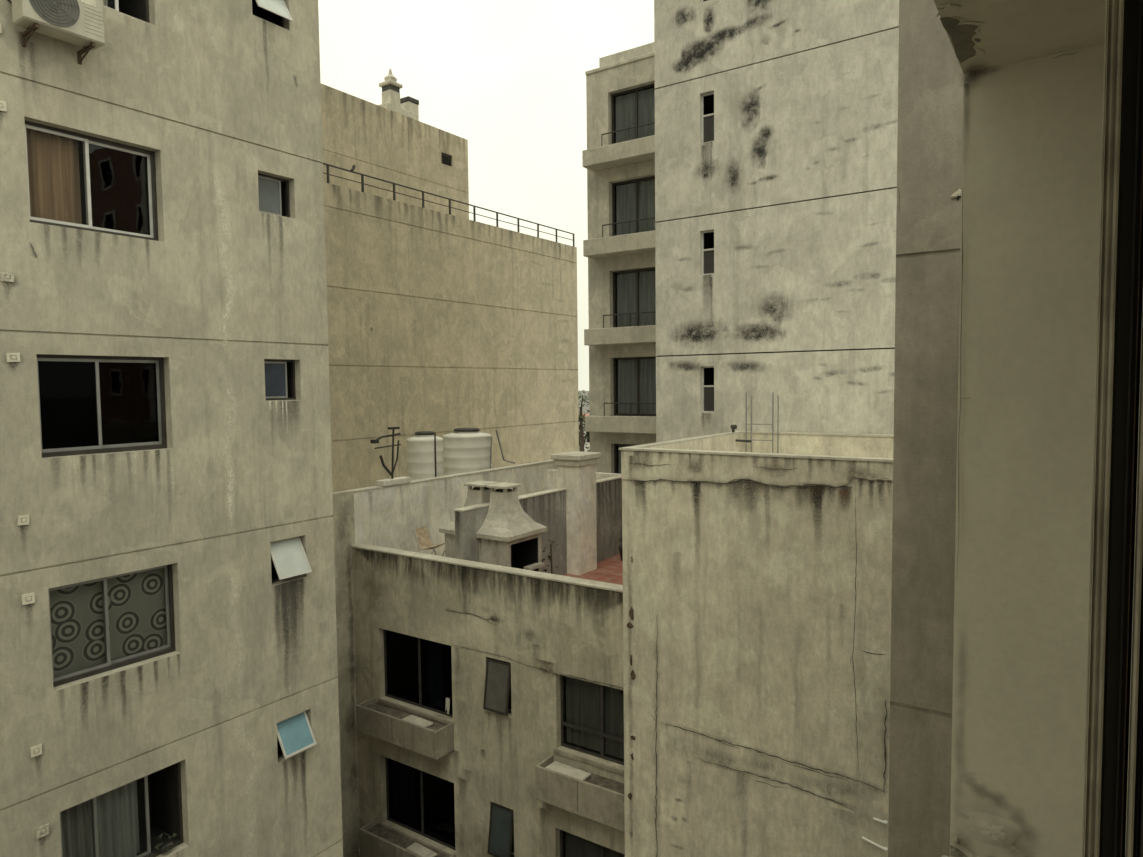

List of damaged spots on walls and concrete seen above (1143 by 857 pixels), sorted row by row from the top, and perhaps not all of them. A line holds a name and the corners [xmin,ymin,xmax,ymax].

peeling [936,1,985,63]
leakage [799,479,890,506]
leakage [439,564,563,594]
leakage [584,587,623,603]